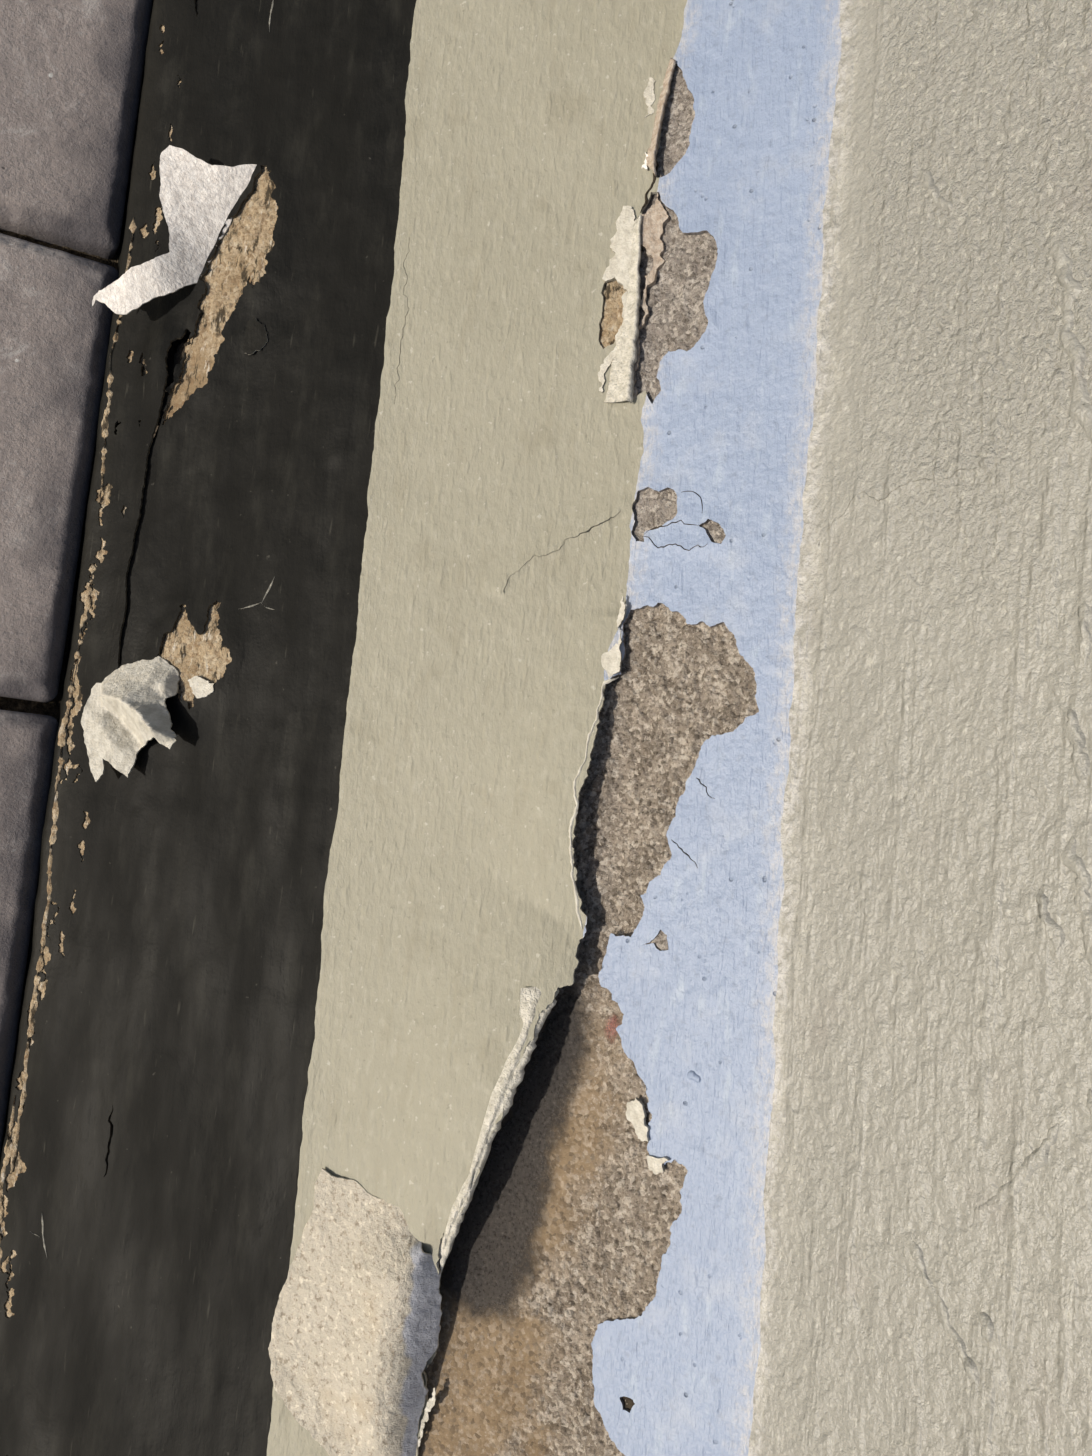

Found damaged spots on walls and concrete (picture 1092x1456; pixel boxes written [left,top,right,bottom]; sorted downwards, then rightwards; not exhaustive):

peeling [0,125,278,1318]
flaking render [268,596,759,1456]
peeling [598,57,718,404]
peeling [632,488,726,551]